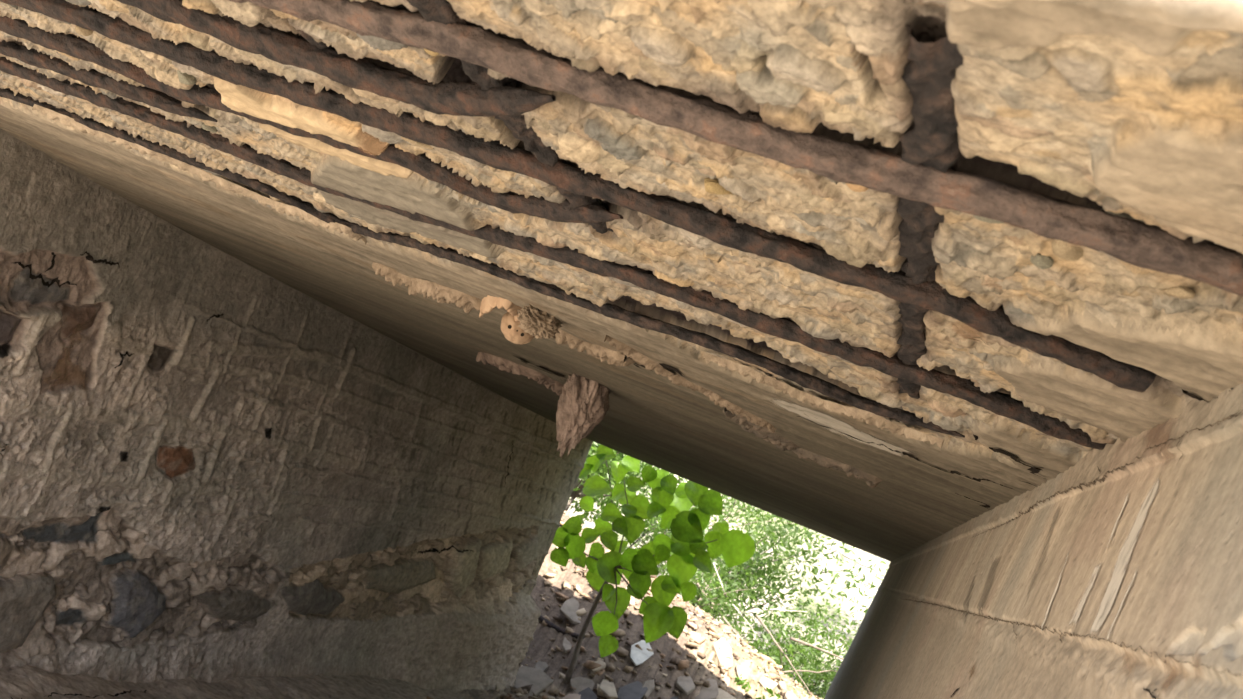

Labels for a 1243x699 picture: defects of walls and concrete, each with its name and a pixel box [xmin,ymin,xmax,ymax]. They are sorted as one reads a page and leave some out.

spalling [0,0,1243,463]
spalling [604,335,883,488]
crack [798,388,1243,539]
crack [901,598,1242,699]
peeling [1168,617,1243,661]